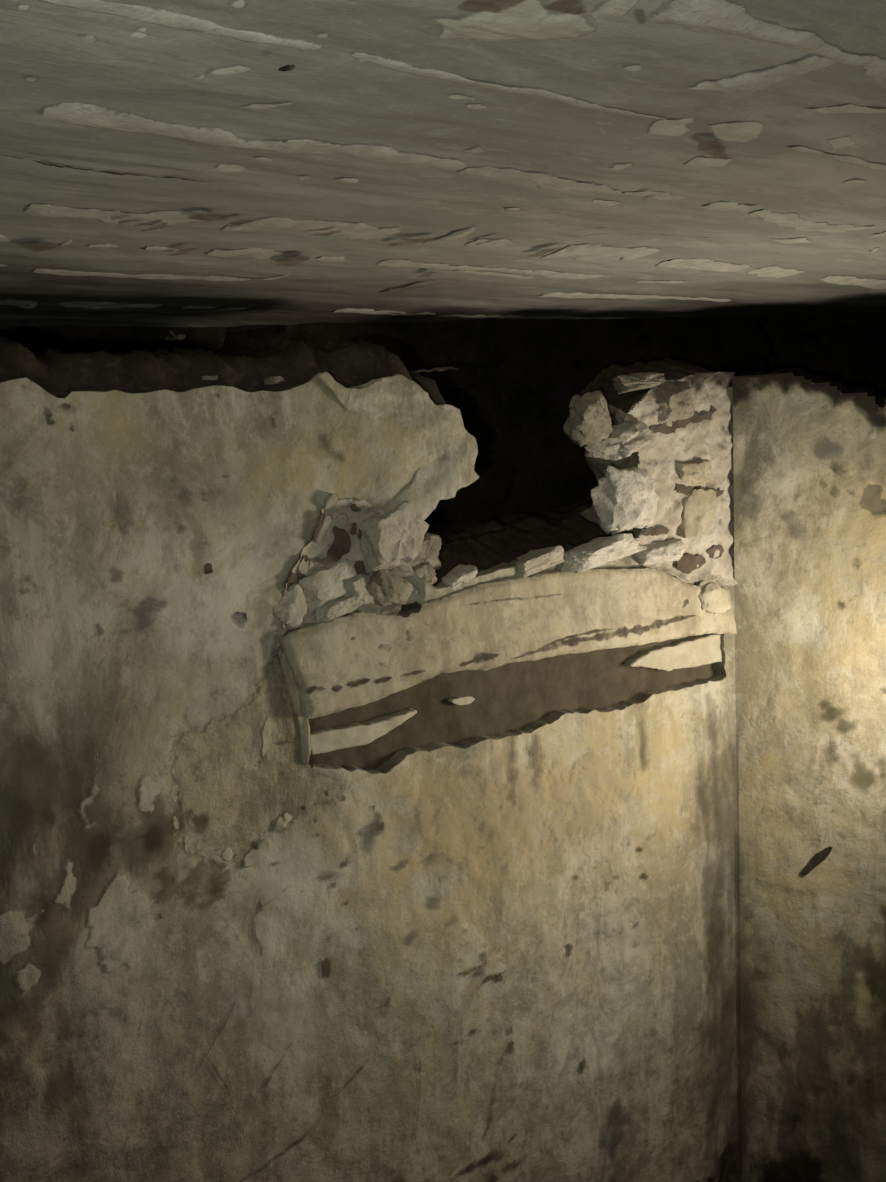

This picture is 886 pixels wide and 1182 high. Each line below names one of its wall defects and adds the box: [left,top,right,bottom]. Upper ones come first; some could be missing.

peeling [434,0,638,41]
peeling [709,121,765,142]
spalling [285,372,479,595]
spalling [614,373,738,586]
peeling [0,859,77,993]
peeling [86,871,155,973]
damp [156,862,230,919]
damp [361,820,383,849]
damp [459,953,503,983]
damp [700,745,744,983]
damp [696,969,828,1182]
damp [460,1150,520,1182]